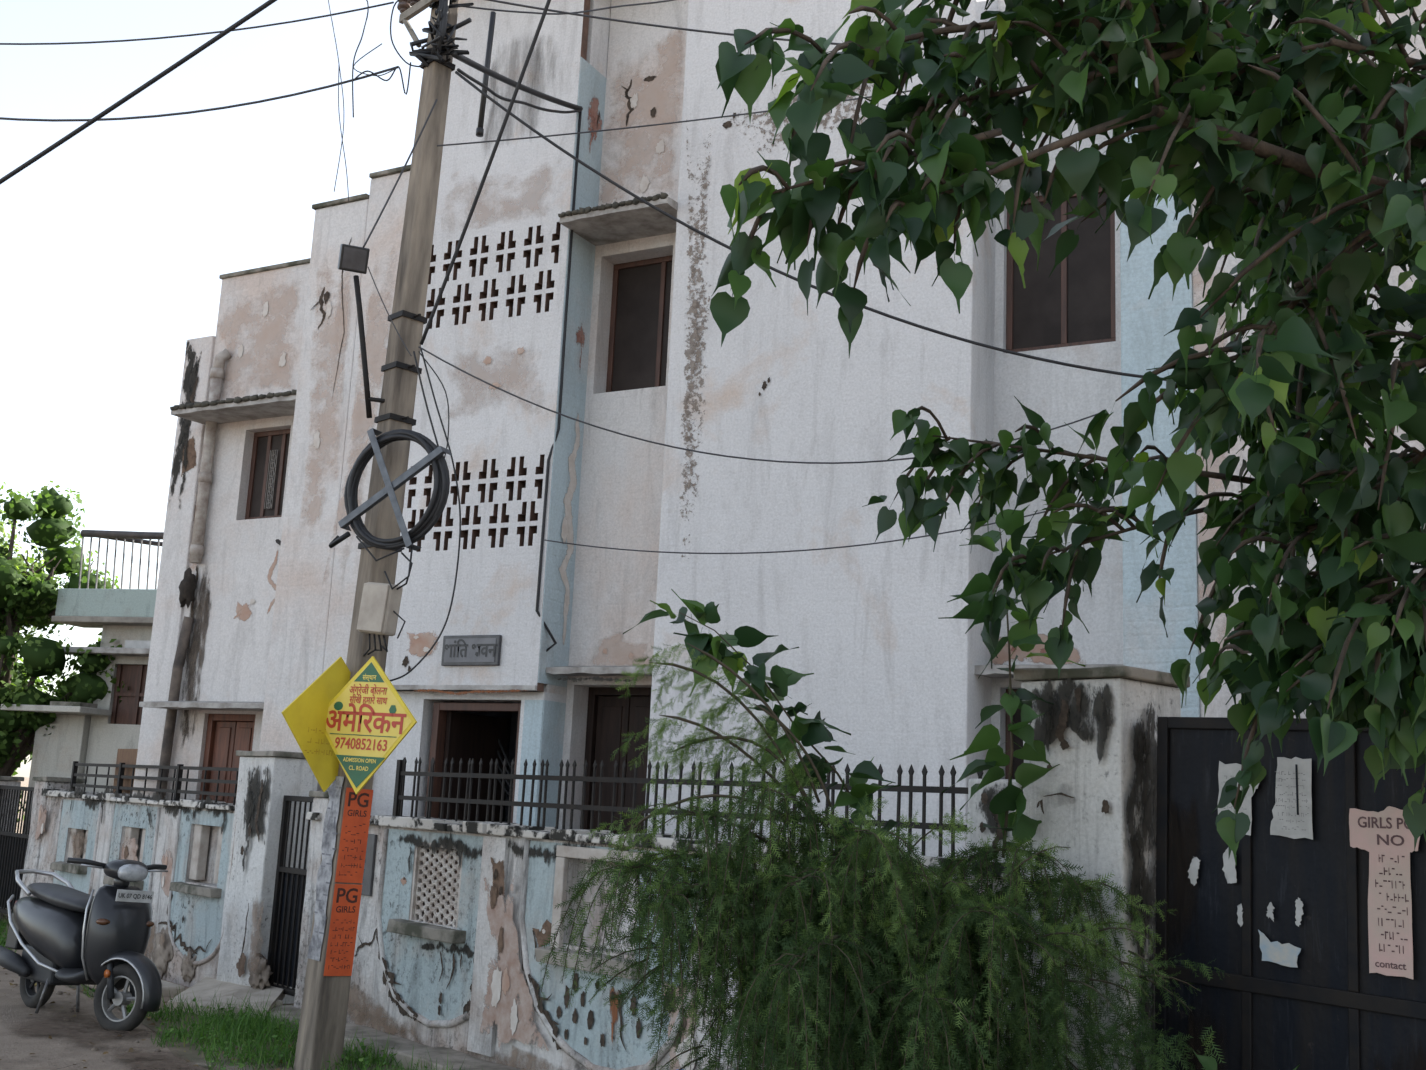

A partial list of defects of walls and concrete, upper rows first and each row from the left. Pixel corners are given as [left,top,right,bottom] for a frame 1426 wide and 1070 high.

water stain [171,340,202,508]
peeling [234,550,278,621]
water stain [180,567,211,744]
mould [1030,678,1113,763]
water stain [69,764,271,871]
peeling [463,857,552,1058]
peeling [556,973,605,1047]
peeling [630,994,641,1038]